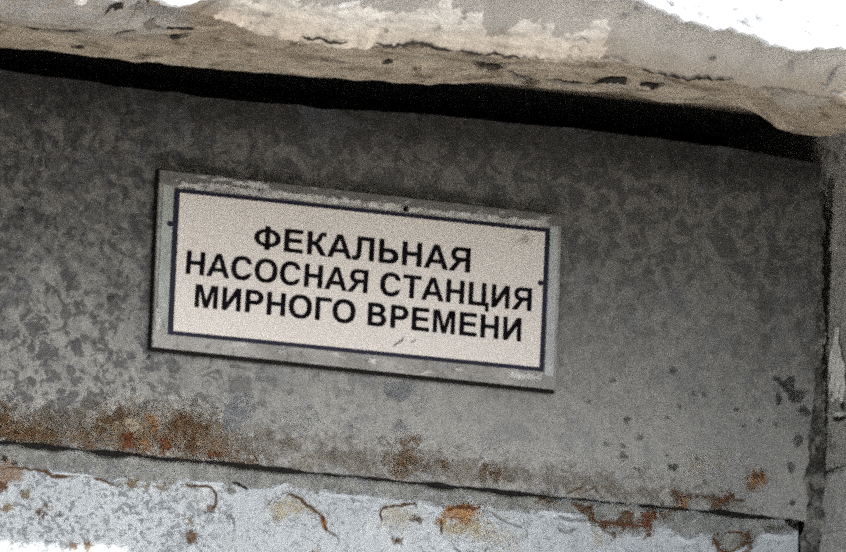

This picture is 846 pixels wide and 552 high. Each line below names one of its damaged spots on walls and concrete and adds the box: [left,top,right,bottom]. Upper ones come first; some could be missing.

flaking render [177,0,846,101]
rust [0,397,260,470]
rust [0,450,172,499]
rust [384,434,449,485]
rust [746,469,767,491]
rust [186,517,198,544]
rust [435,503,483,535]
rust [571,486,746,541]
rust [711,530,753,552]